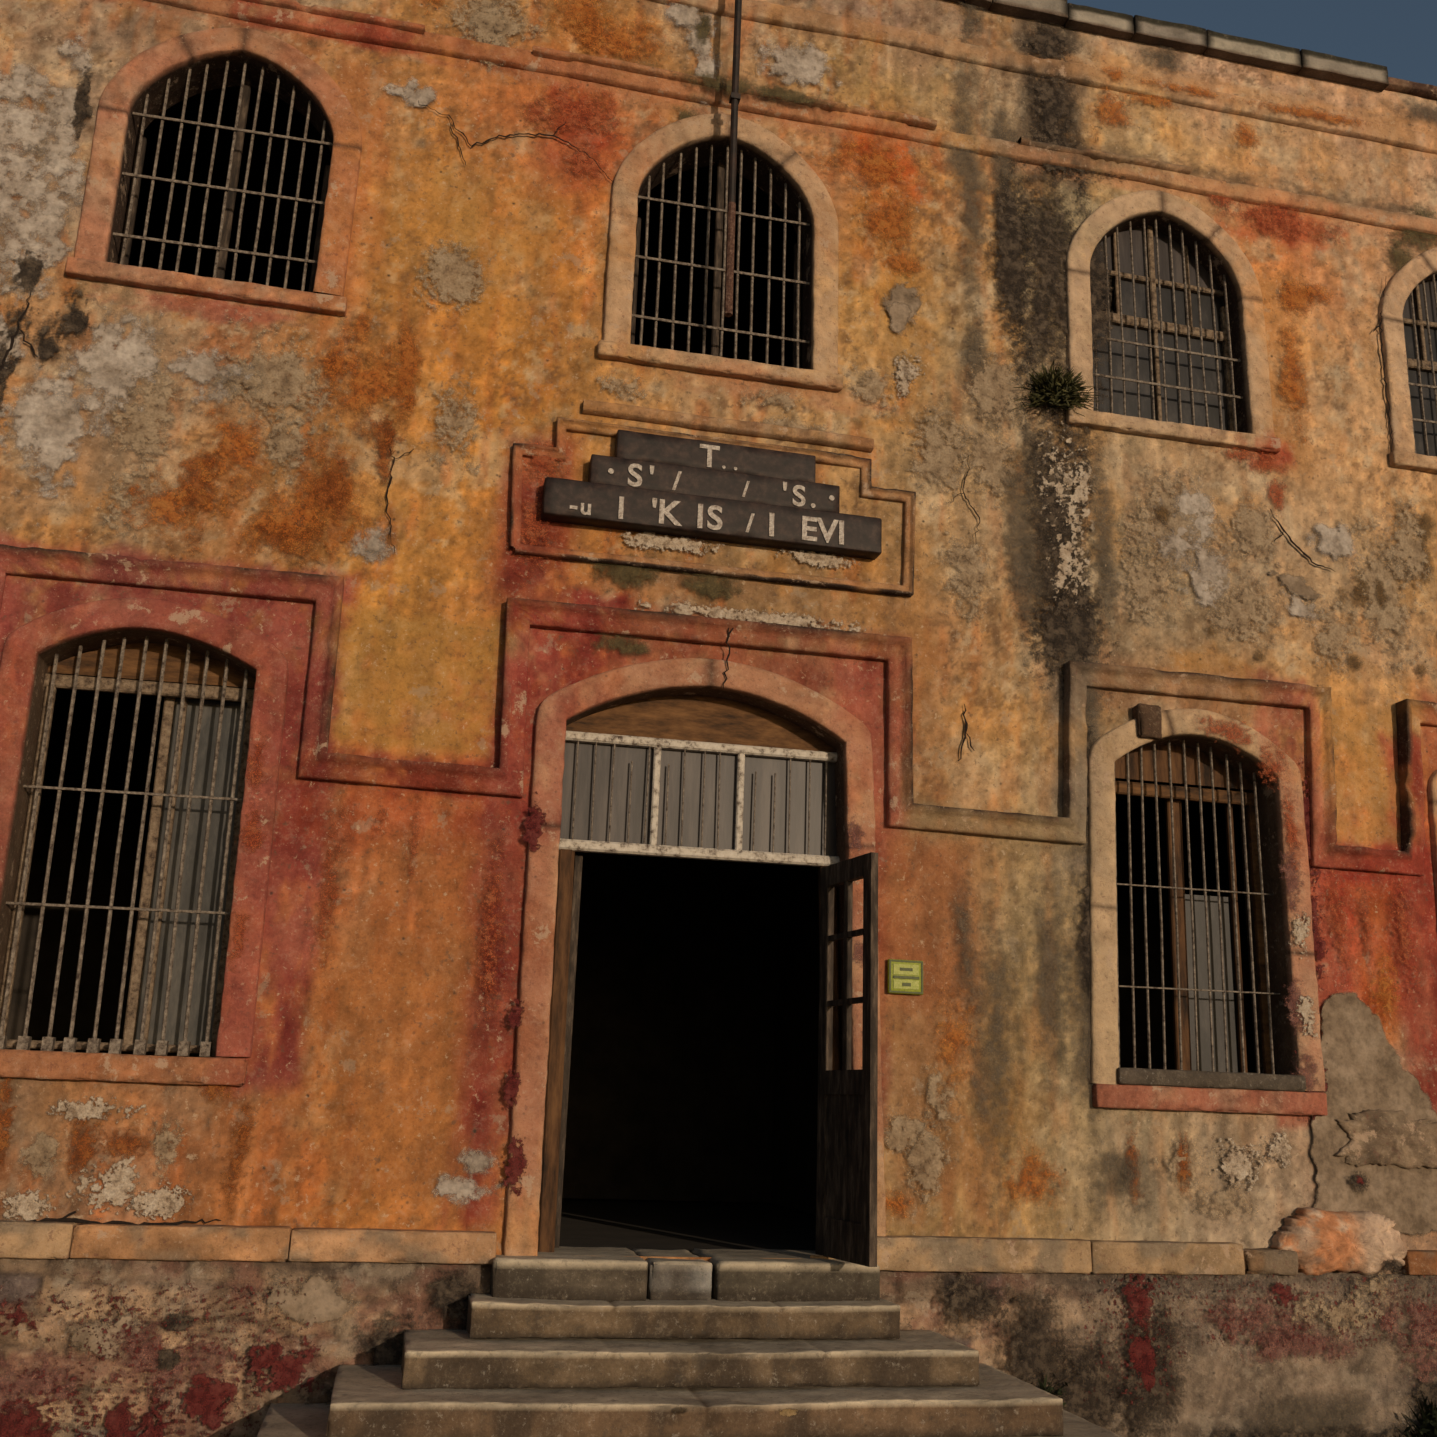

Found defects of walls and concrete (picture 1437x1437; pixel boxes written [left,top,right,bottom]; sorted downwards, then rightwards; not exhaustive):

peeling [0,34,92,301]
crack [418,100,613,182]
water stain [952,73,1126,412]
water stain [1023,23,1099,149]
peeling [0,312,352,537]
crack [723,628,733,689]
crack [958,704,975,761]
water stain [1002,406,1117,693]
peeling [848,346,1431,692]
crack [1270,509,1335,572]
peeling [1,1094,194,1221]
flaking render [1285,980,1437,1236]